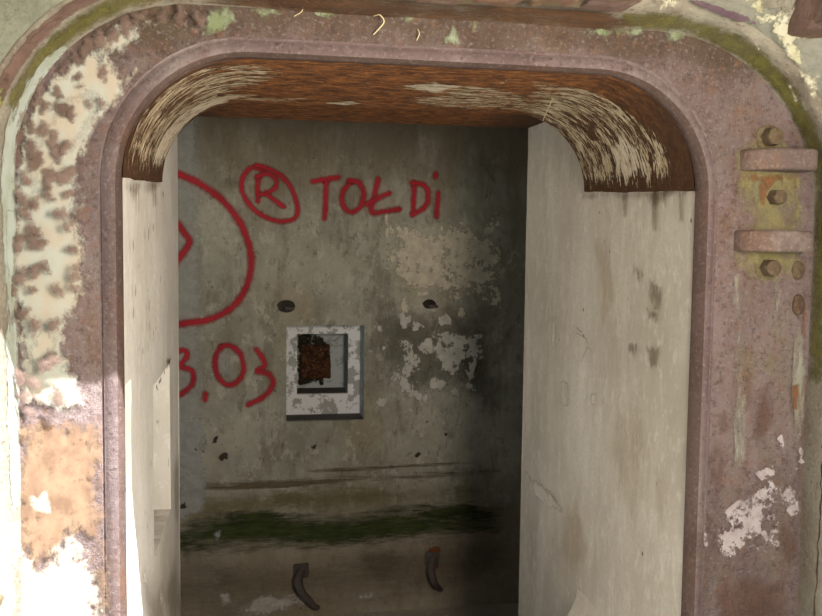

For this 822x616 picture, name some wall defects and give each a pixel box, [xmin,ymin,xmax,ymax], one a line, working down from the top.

peeling [1,25,139,511]
peeling [385,208,502,412]
rust [12,351,104,570]
crack [813,463,822,616]